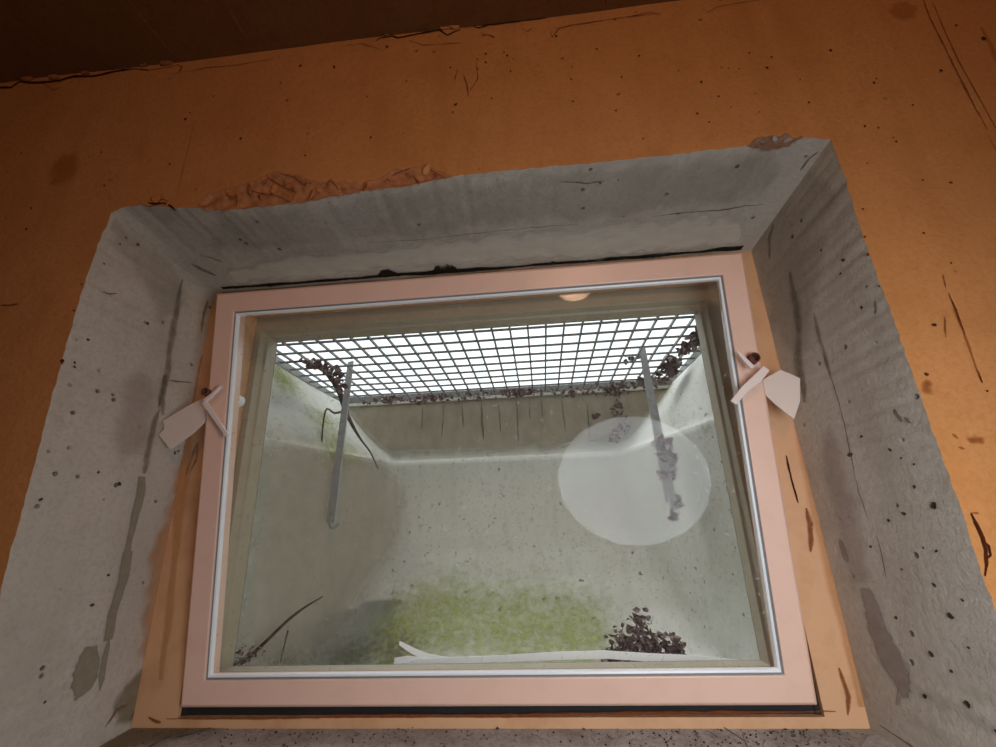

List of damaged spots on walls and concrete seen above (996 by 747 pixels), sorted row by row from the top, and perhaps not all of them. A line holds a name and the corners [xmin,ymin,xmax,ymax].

crack [0,59,269,90]
spalling [749,133,803,151]
spalling [195,164,450,211]